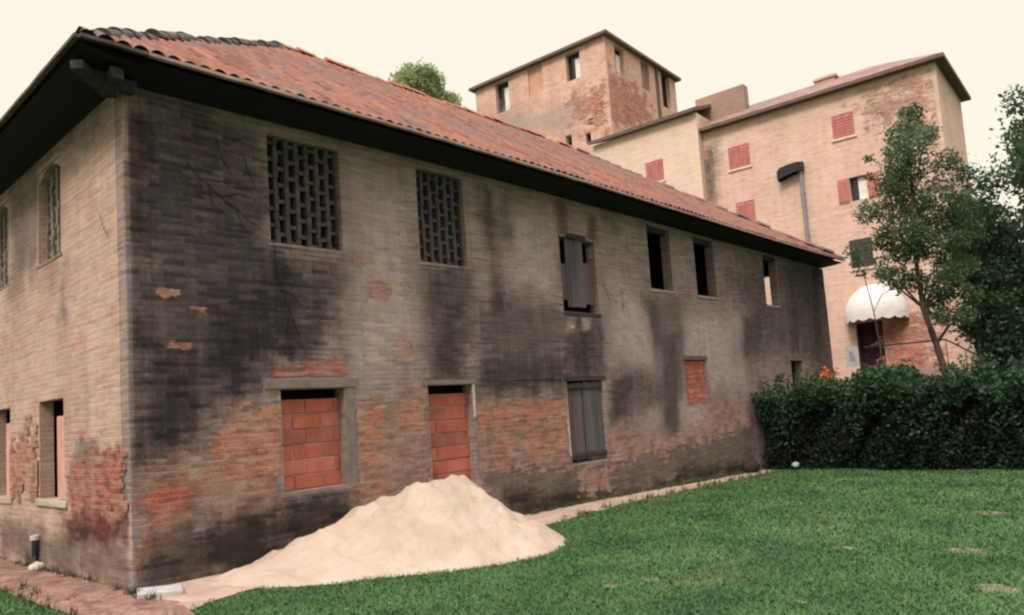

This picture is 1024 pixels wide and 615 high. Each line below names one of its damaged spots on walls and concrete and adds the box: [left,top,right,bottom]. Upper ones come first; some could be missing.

spalling [560,55,655,146]
spalling [156,286,181,299]
spalling [167,341,193,350]
damp [129,106,341,457]
crack [187,134,307,356]
flaking render [269,193,417,377]
damp [482,286,602,388]
damp [613,303,684,431]
spalling [8,414,38,511]
spalling [64,396,287,578]
damp [142,493,350,582]
spalling [339,369,433,506]